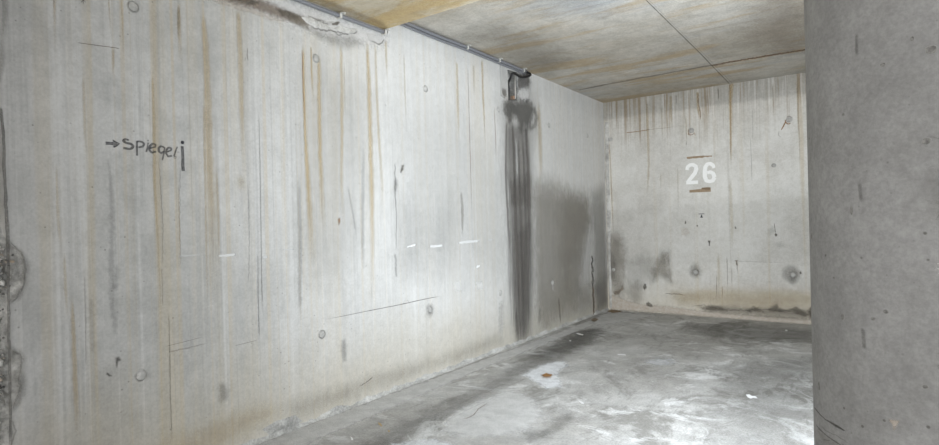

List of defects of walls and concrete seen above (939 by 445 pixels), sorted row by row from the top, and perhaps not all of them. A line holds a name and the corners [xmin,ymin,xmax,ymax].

spalling [0,227,25,445]
damp [261,74,811,445]